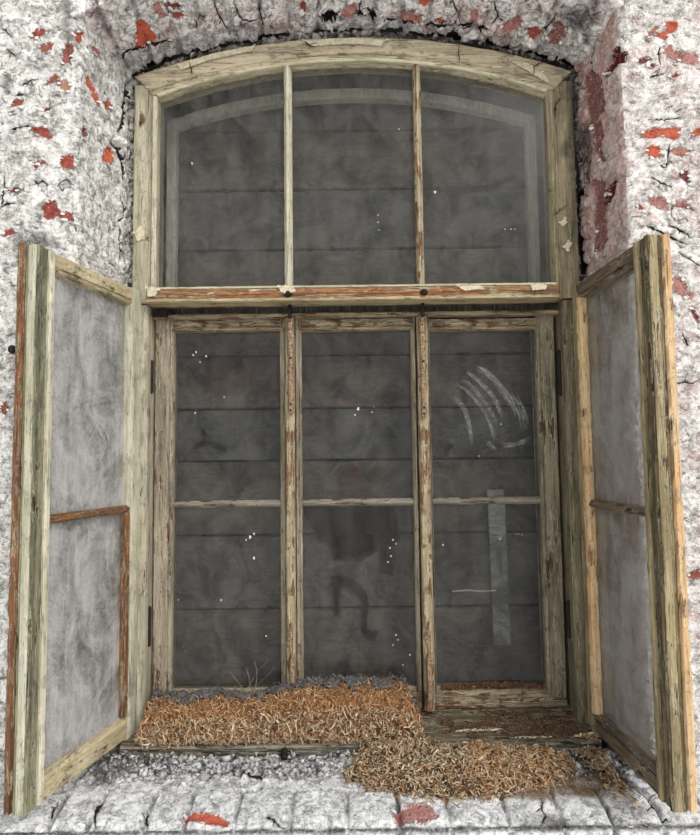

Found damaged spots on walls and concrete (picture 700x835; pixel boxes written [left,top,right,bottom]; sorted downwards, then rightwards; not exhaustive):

spalling [125,19,158,67]
spalling [500,15,570,49]
spalling [85,73,114,113]
spalling [584,18,700,162]
spalling [102,136,128,165]
crack [110,3,272,261]
spalling [41,199,74,222]
spalling [581,178,618,252]
spalling [183,810,231,828]
spalling [391,802,440,828]